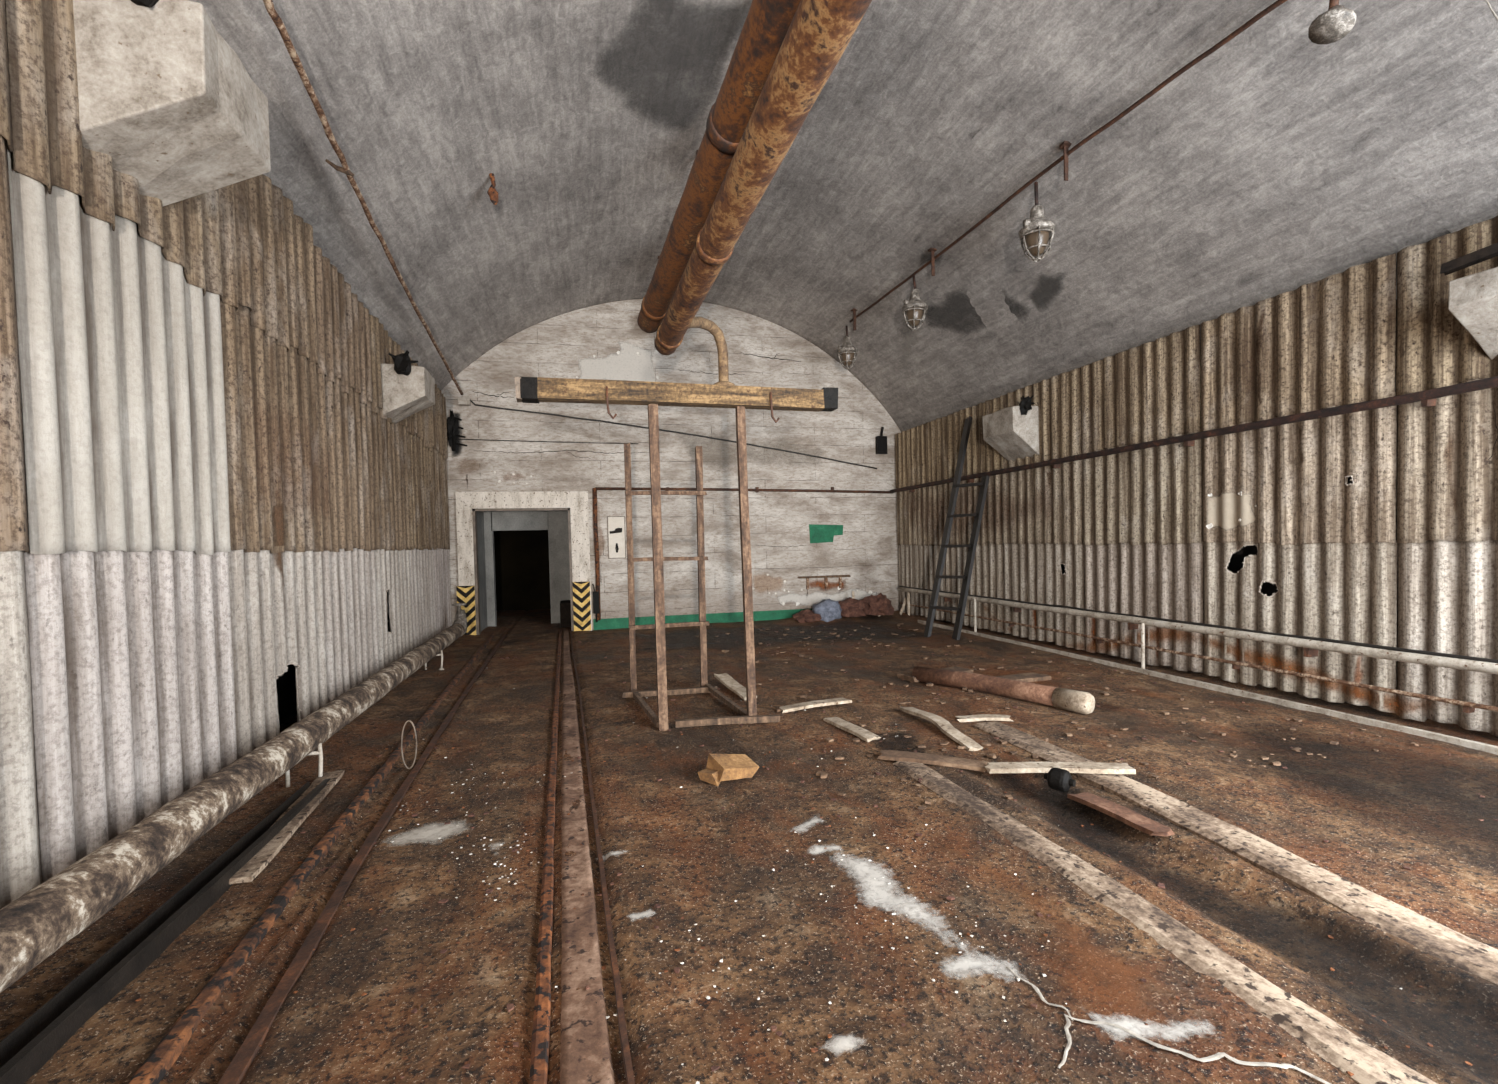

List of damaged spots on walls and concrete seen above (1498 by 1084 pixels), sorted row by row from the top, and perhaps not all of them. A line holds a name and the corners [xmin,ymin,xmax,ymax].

damp [599,0,751,128]